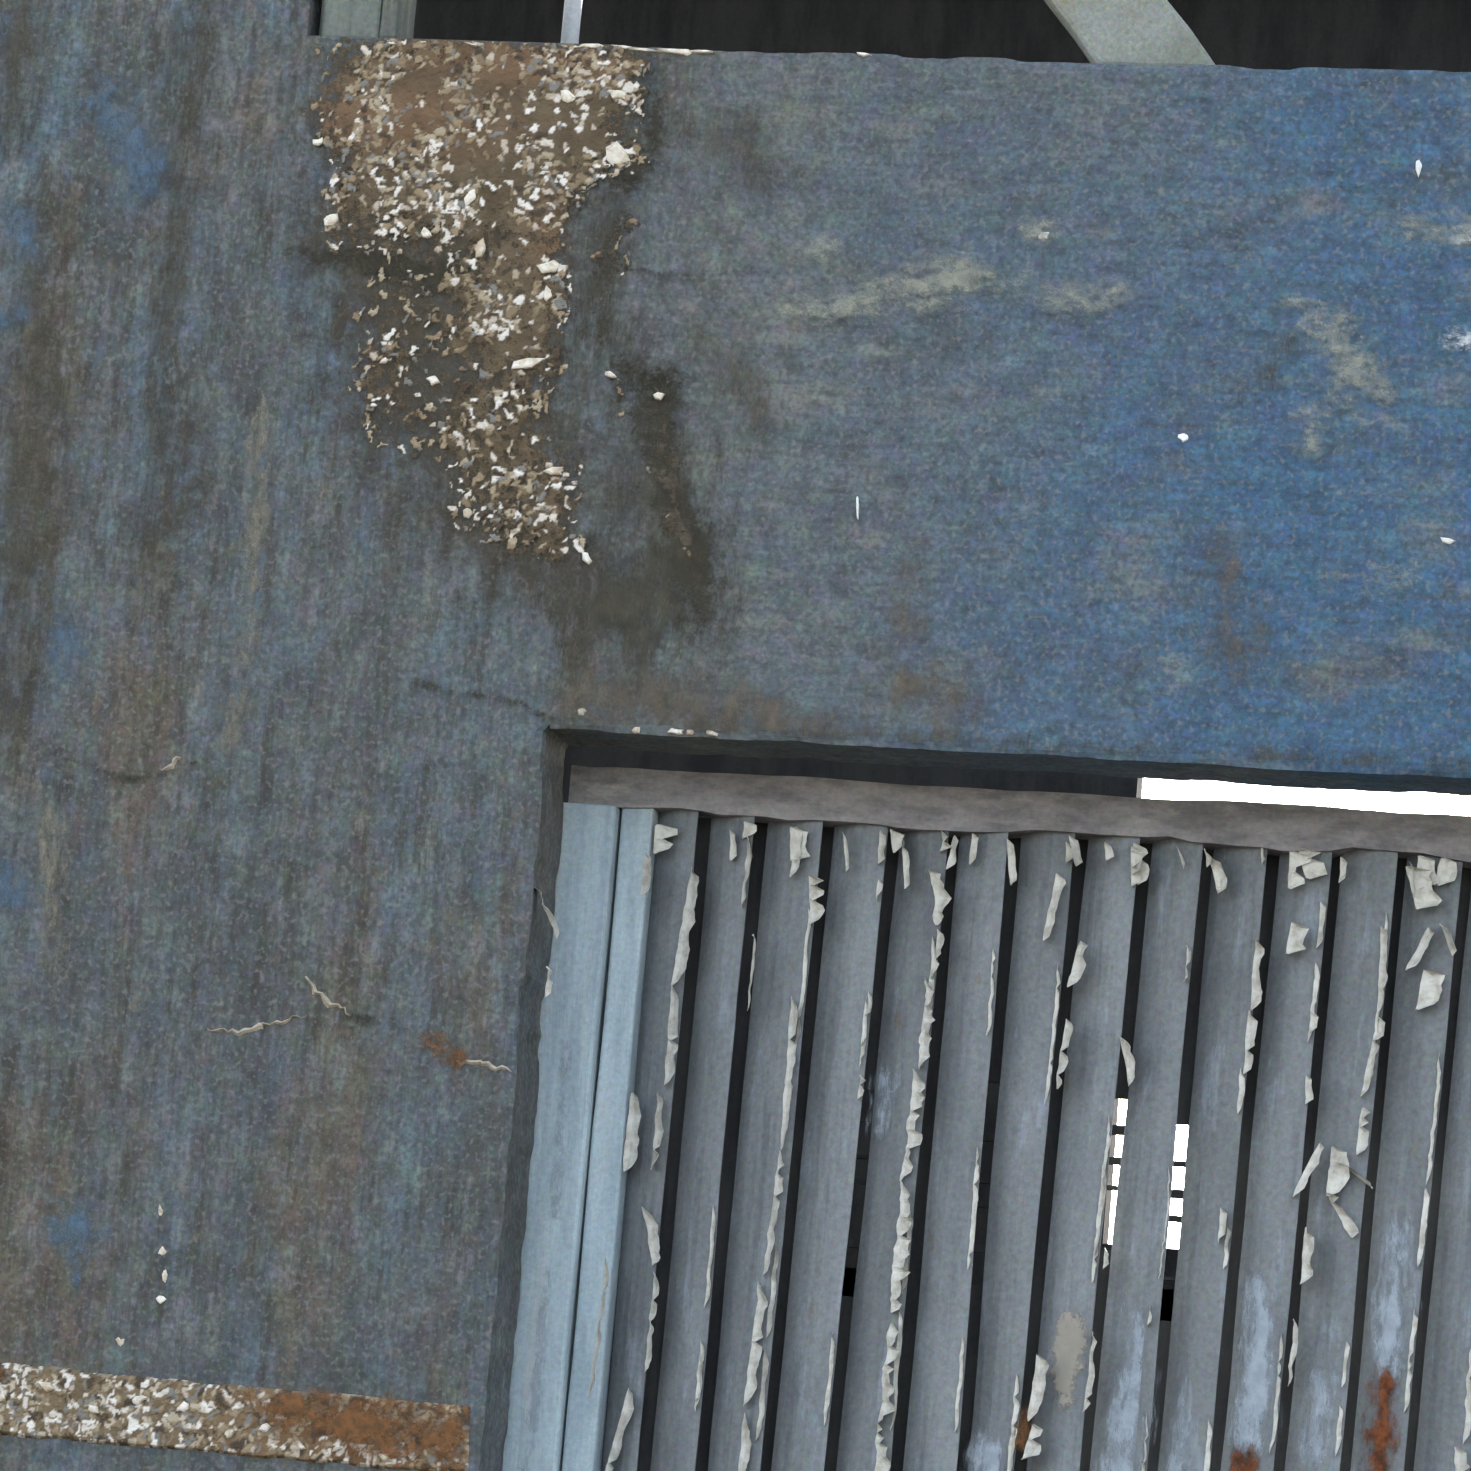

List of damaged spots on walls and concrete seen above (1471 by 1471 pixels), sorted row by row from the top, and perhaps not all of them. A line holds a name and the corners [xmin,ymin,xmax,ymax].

leakage [588,57,664,294]
spalling [301,37,715,587]
leakage [1449,332,1471,348]
leakage [287,191,994,742]
crack [207,976,371,1036]
crack [461,1059,512,1072]
peeling [738,826,825,1471]
peeling [857,829,979,1471]
spalling [0,1363,471,1471]
corrosion [243,1389,467,1461]
corrosion [1229,1448,1259,1471]
corrosion [1362,1370,1400,1471]